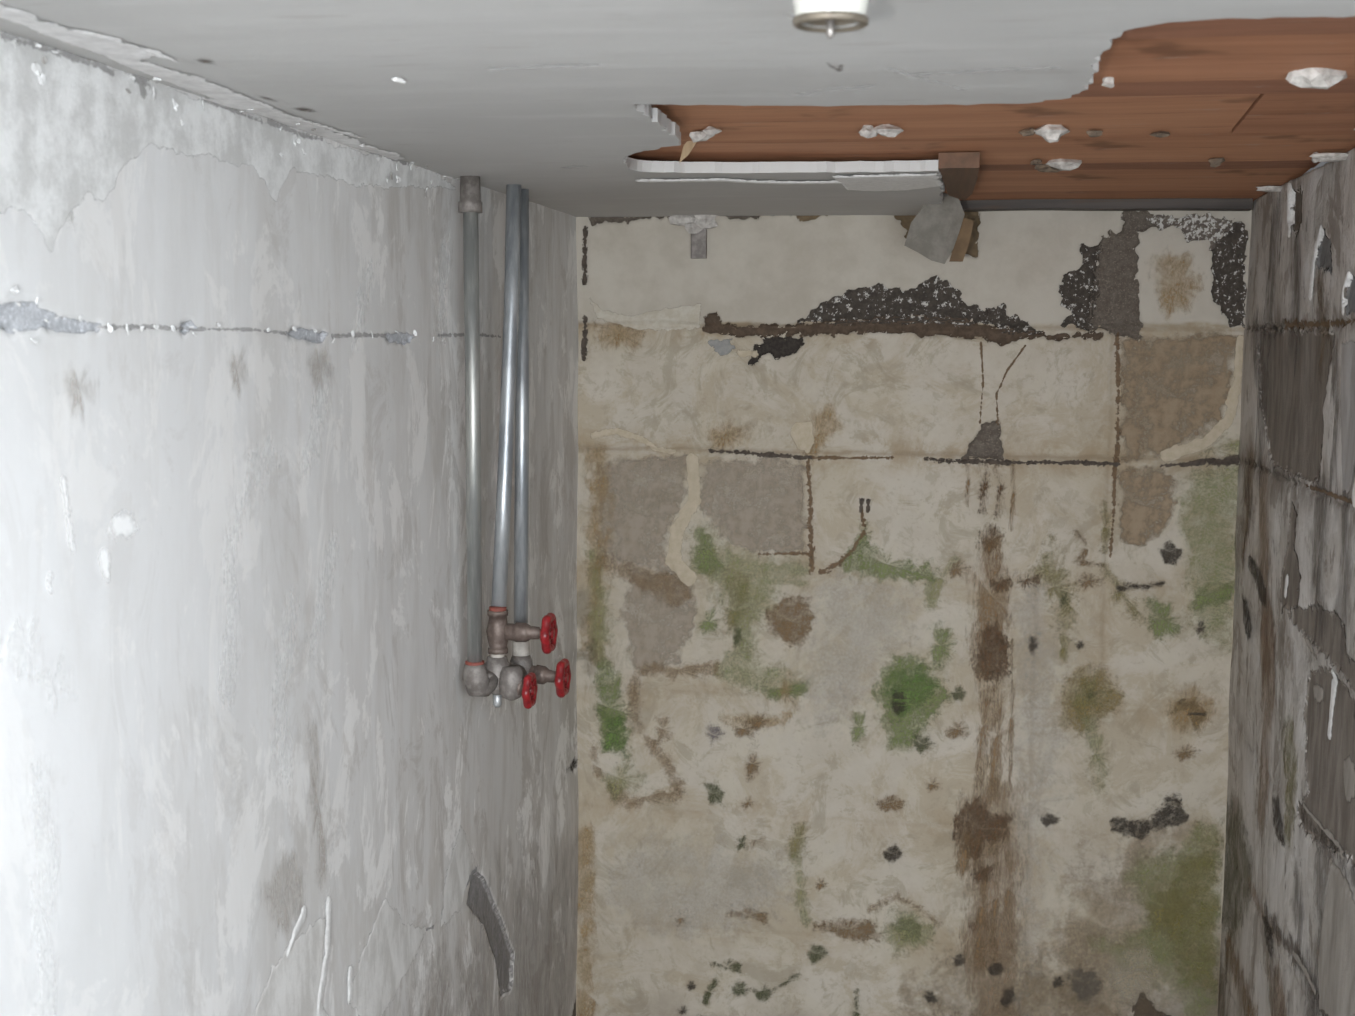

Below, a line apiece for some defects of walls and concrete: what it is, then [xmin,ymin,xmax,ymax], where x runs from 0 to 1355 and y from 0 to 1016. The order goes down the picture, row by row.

peeling [832,173,943,191]